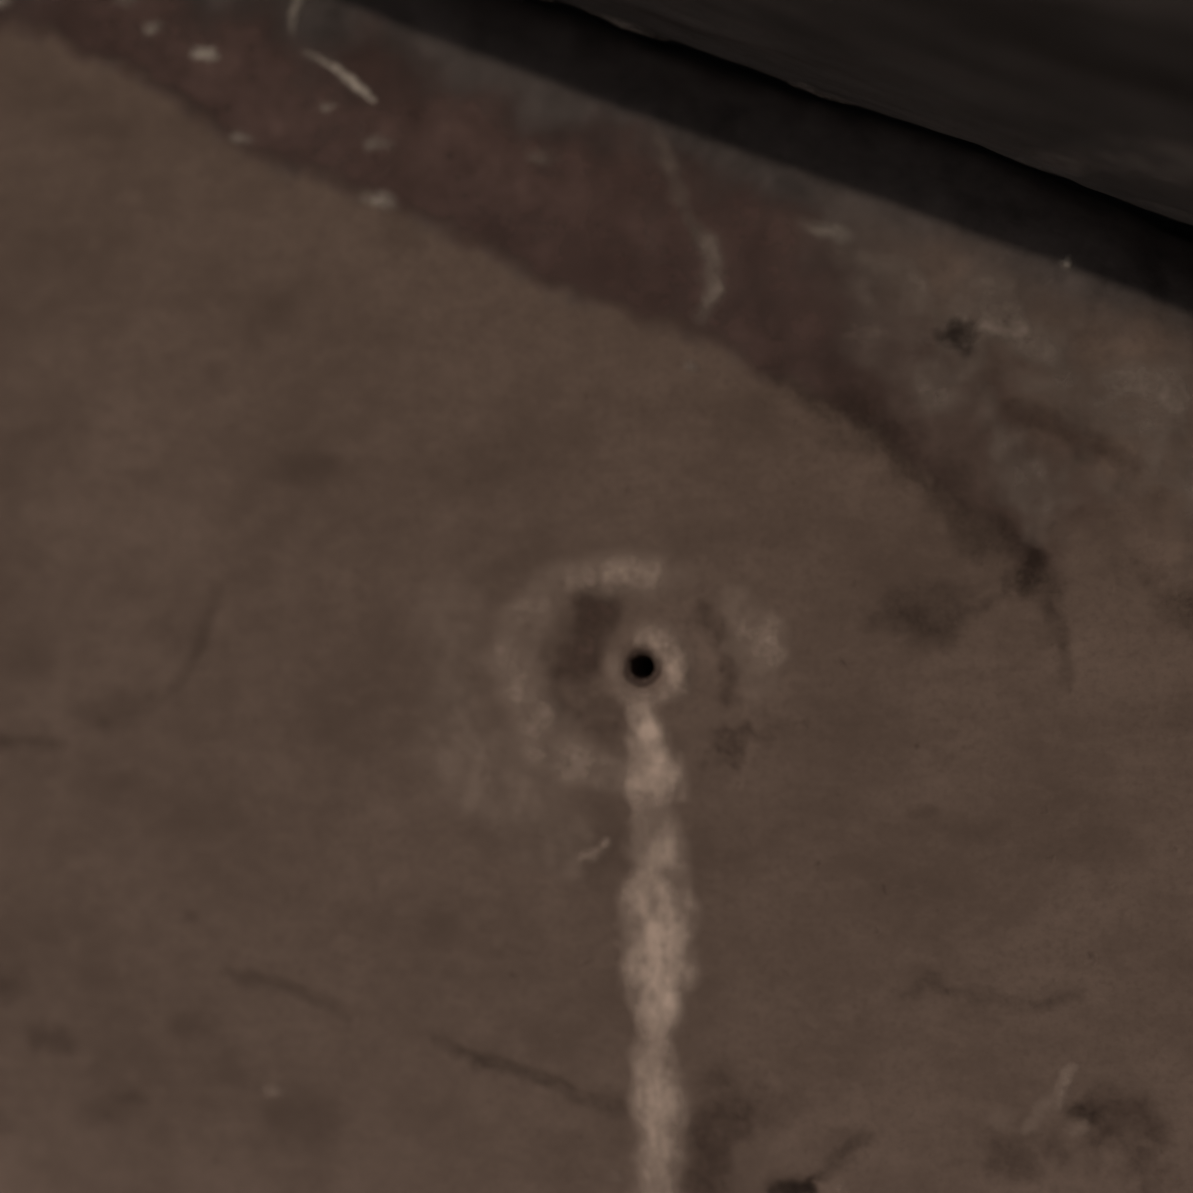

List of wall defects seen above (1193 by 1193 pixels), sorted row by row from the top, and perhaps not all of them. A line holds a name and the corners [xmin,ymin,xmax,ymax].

leakage [626,626,688,803]
leakage [625,836,690,1193]